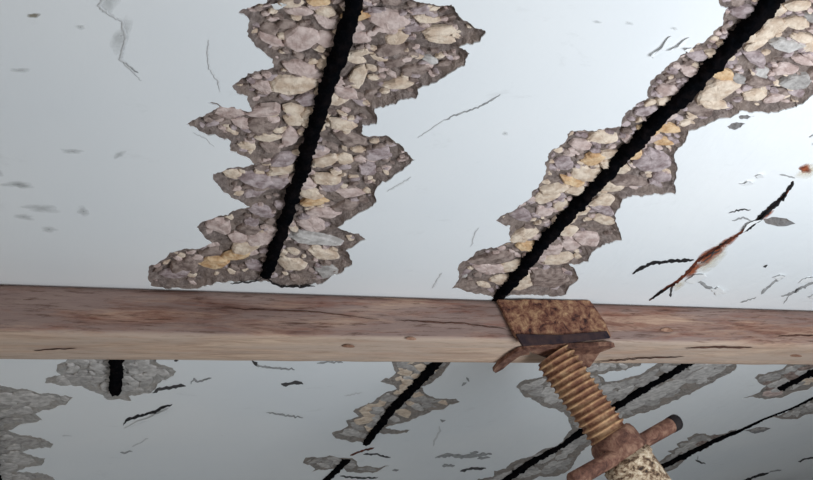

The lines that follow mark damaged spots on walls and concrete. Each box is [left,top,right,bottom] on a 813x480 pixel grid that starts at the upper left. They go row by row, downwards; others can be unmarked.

crack [97,0,141,81]
spalling [148,0,485,289]
spalling [453,0,813,297]
rust [687,236,735,276]
crack [740,265,813,304]
spalling [0,359,176,480]
spalling [303,455,385,473]
spalling [332,362,459,442]
spalling [478,376,591,480]
spalling [586,363,737,419]
spalling [659,427,770,472]
spalling [745,364,813,399]